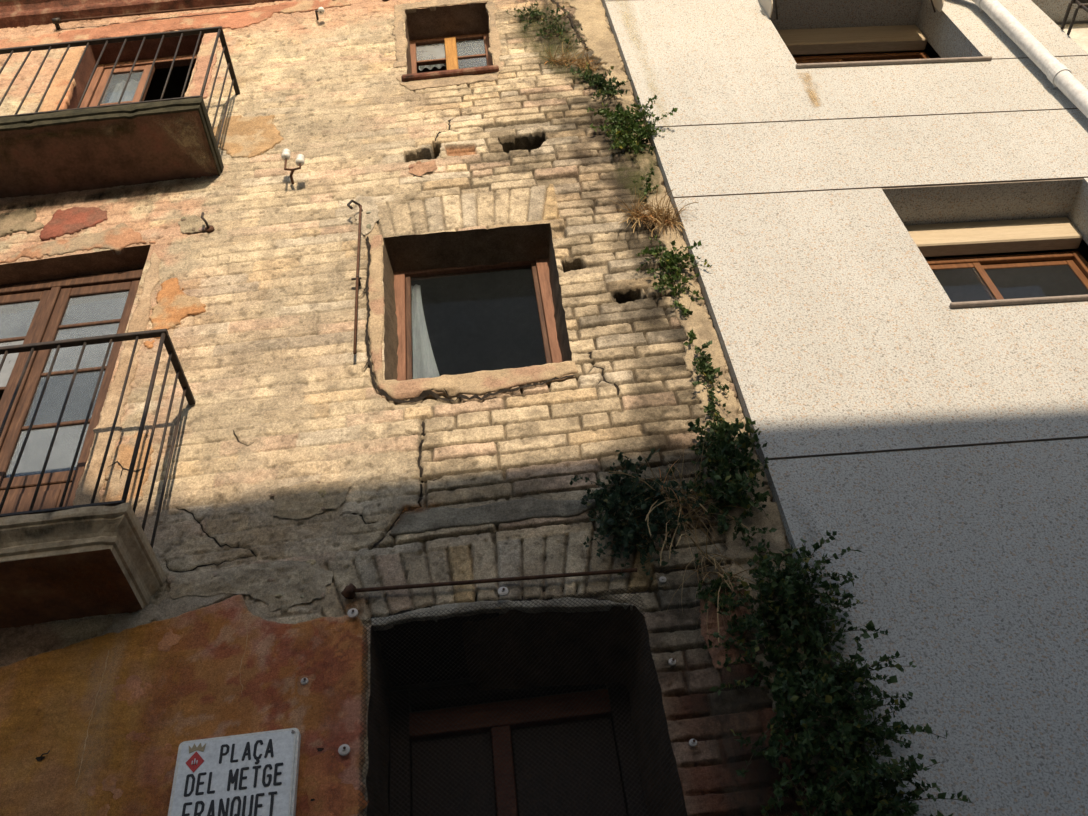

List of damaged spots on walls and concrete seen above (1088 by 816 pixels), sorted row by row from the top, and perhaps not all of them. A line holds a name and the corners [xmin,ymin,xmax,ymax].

flaking render [213,115,284,158]
flaking render [0,207,210,507]
crack [166,508,257,572]
flaking render [0,593,369,816]